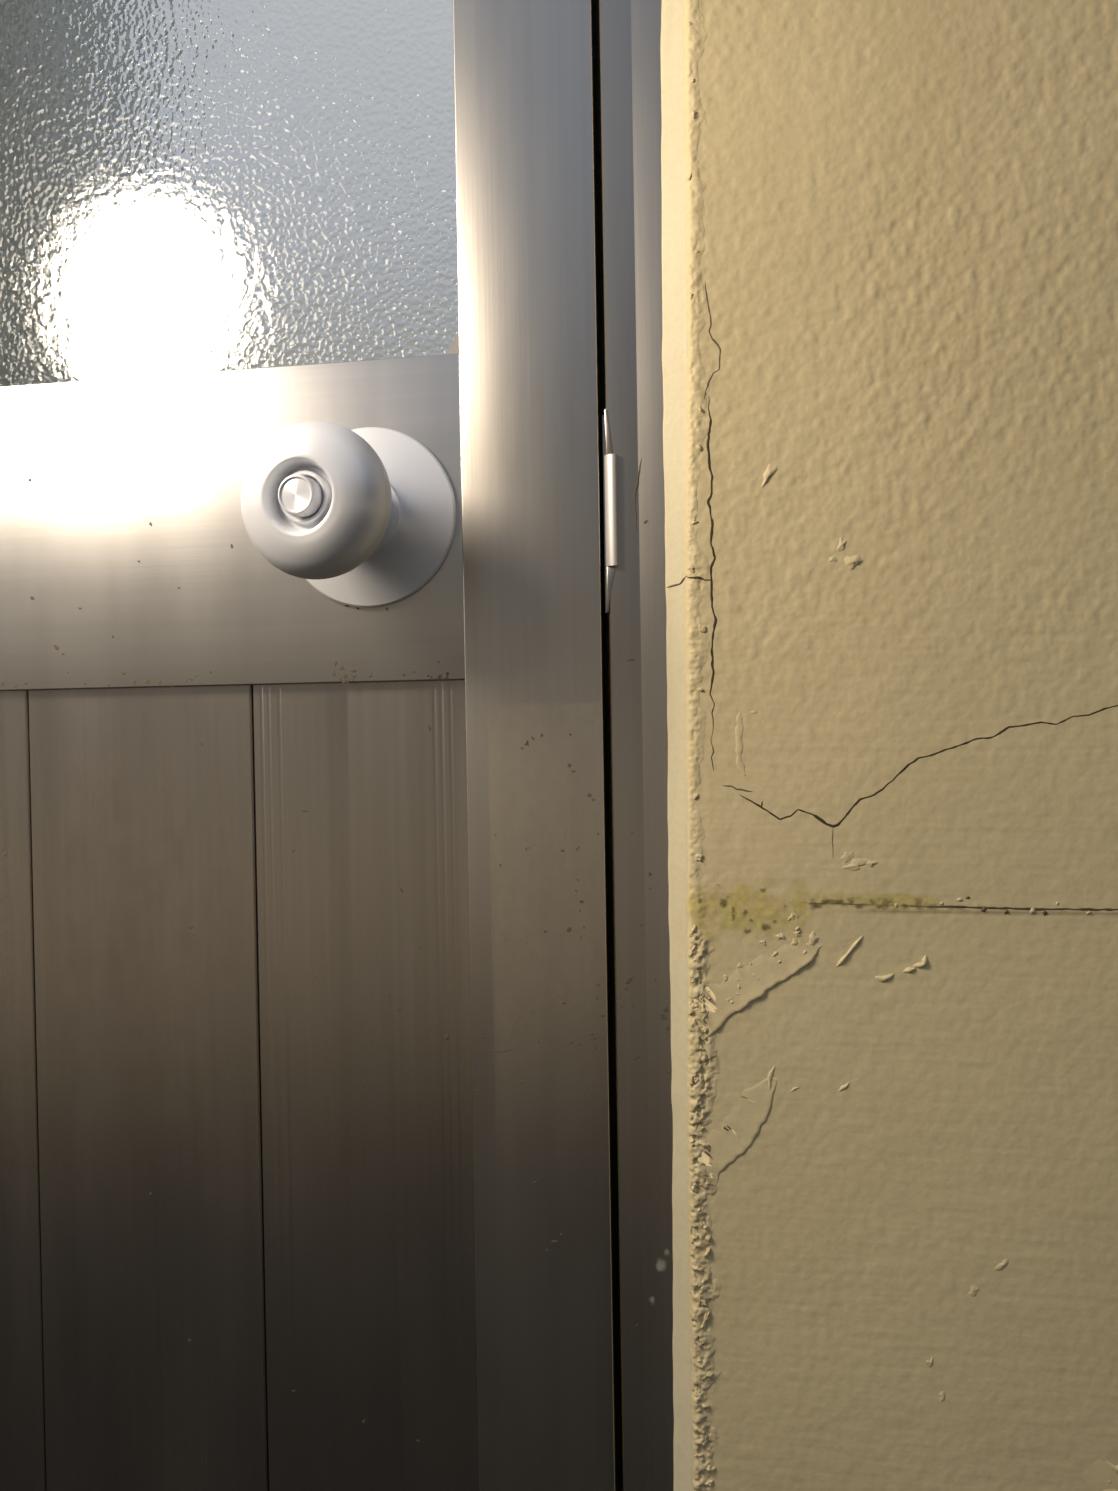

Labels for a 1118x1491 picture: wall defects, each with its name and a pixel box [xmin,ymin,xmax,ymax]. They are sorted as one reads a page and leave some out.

crack [666,284,1118,847]
leakage [690,886,928,933]
crack [804,896,1118,916]